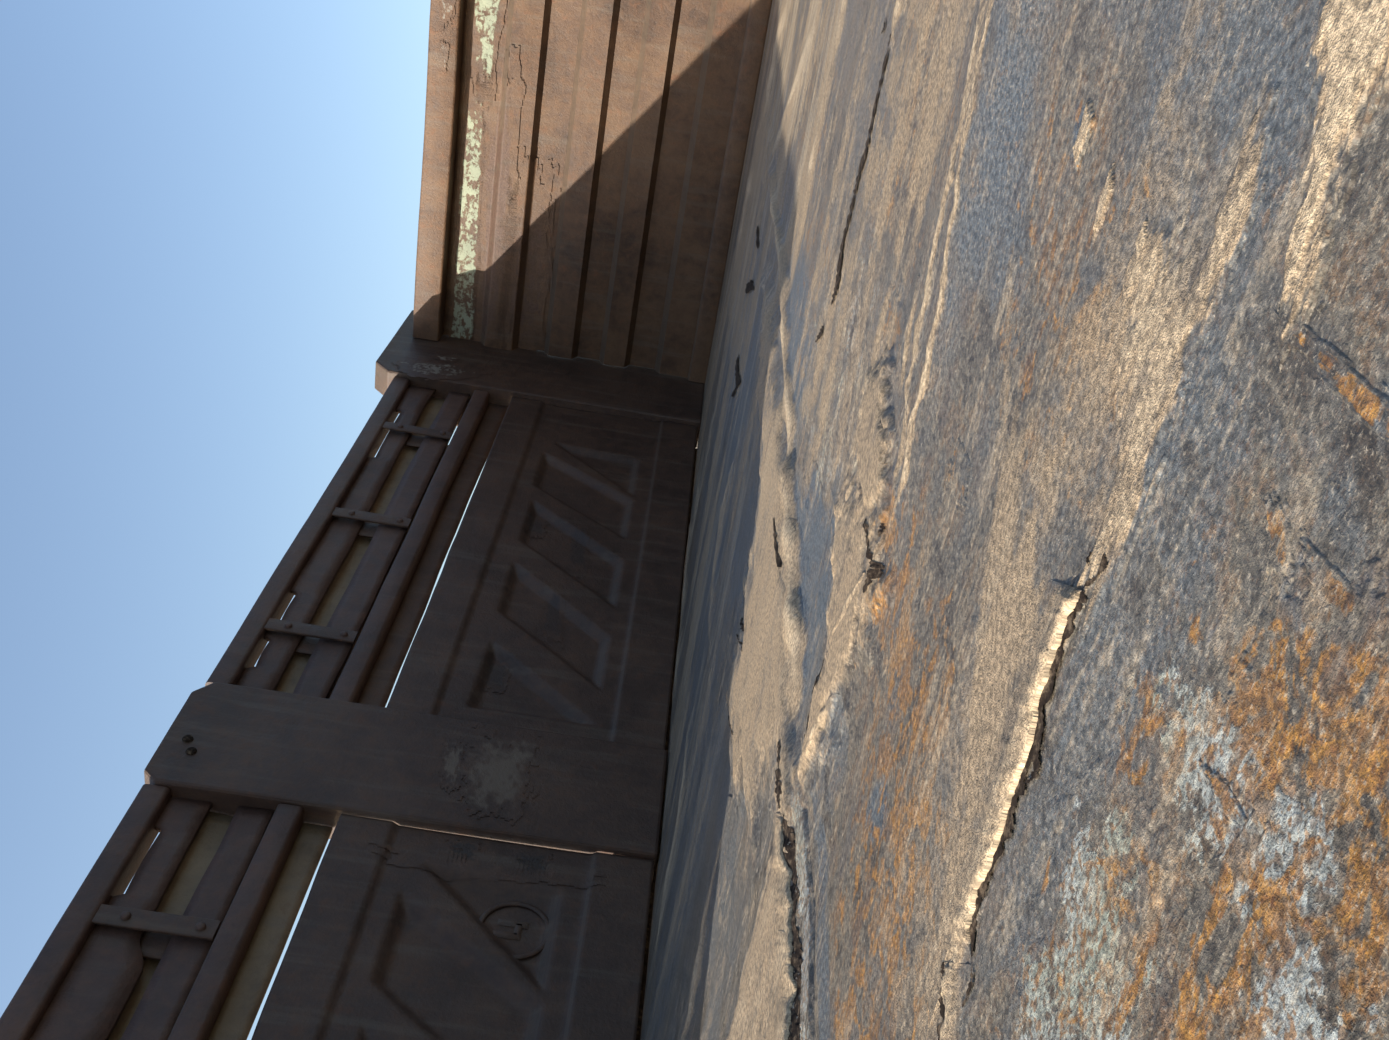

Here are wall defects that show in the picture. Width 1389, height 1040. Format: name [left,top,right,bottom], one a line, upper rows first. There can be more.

peeling [439,0,507,341]
crack [815,21,891,342]
peeling [391,353,493,380]
crack [773,518,782,567]
crack [764,660,824,1040]
crack [937,551,1107,1040]